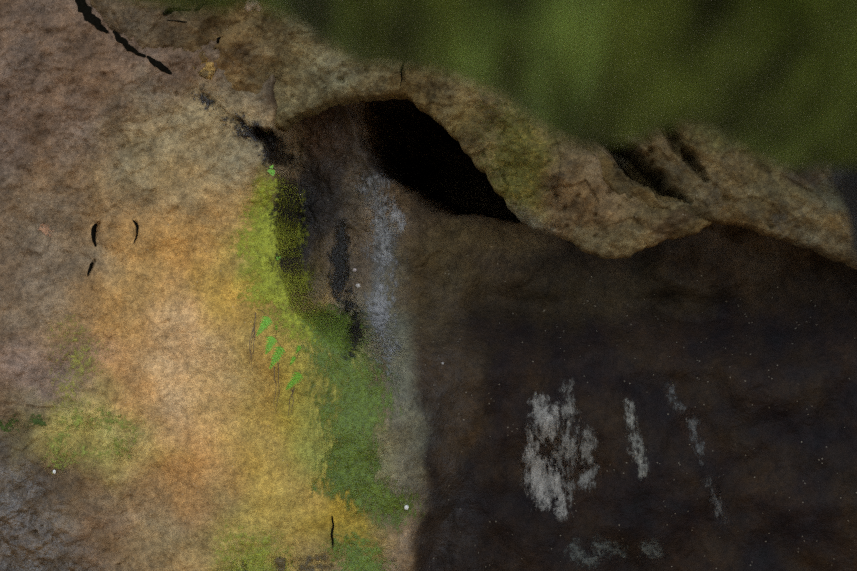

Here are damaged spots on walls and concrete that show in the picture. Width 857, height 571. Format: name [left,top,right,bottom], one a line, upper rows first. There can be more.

crack [75,0,172,74]
water stain [523,380,599,519]
water stain [624,398,647,478]